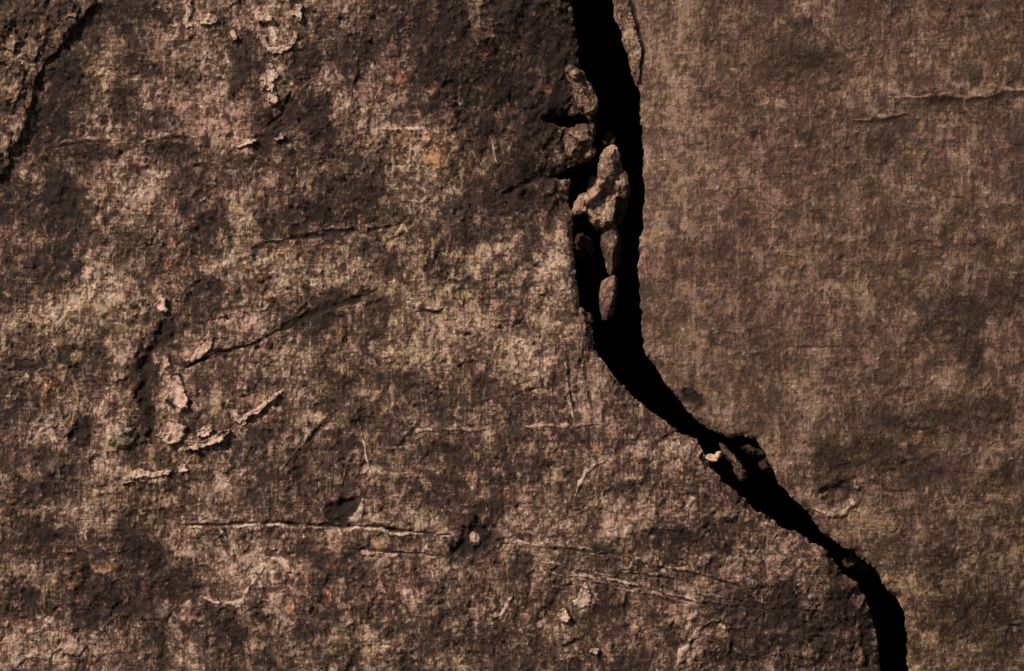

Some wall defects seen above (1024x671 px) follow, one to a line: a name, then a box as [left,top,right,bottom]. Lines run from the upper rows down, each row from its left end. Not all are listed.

crack [501,0,921,671]